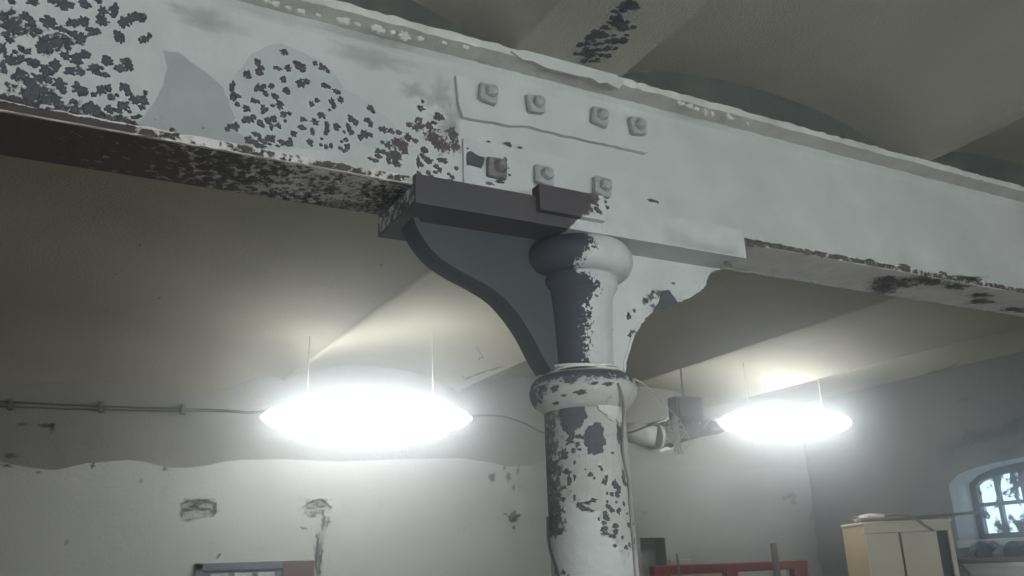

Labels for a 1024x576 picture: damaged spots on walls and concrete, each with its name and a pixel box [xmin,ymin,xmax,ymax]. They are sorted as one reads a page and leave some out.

peeling [573,0,640,64]
peeling [0,0,401,154]
peeling [744,238,1024,293]
spalling [626,282,678,337]
peeling [529,369,635,550]
spalling [180,498,217,522]
spalling [301,498,332,526]